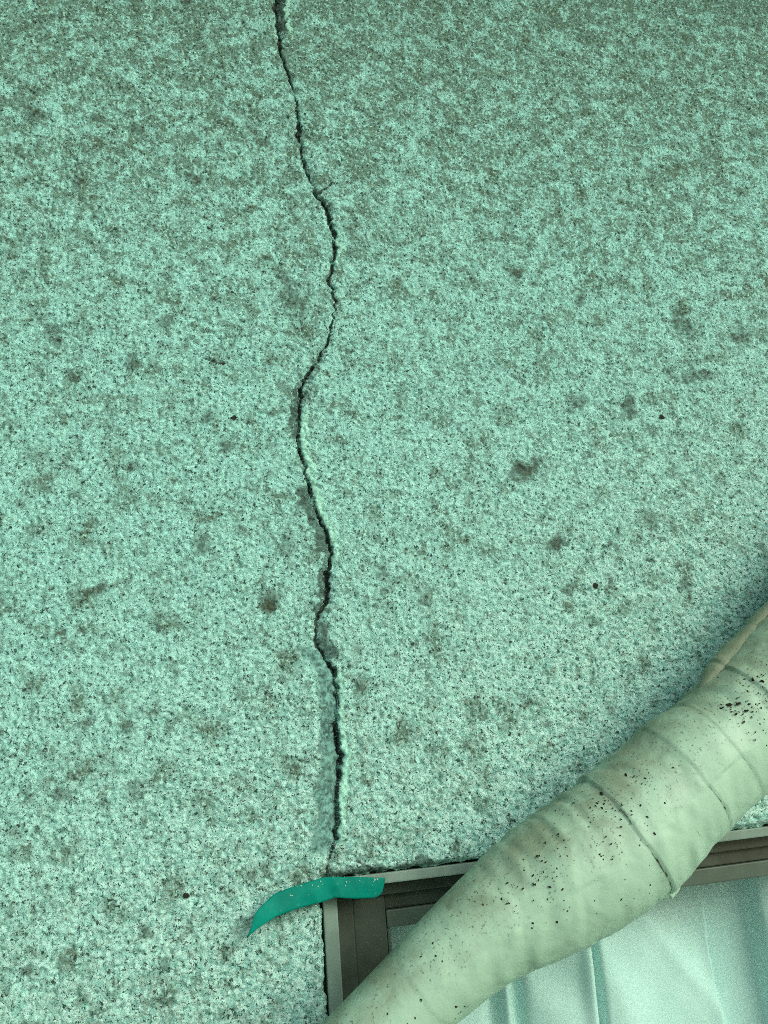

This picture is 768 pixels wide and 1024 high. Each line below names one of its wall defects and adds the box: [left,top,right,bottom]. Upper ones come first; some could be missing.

crack [271,0,377,875]